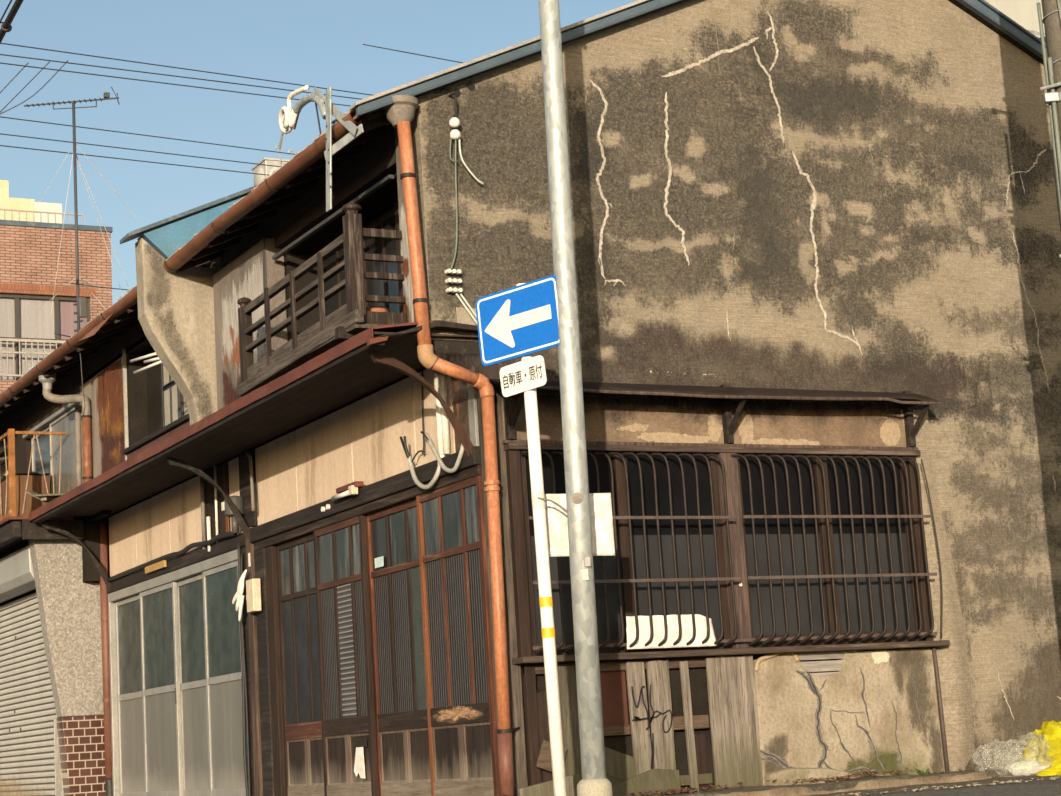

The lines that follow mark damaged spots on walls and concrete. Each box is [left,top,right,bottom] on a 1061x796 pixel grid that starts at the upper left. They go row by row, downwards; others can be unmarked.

water stain [421,74,554,321]
crack [590,80,625,286]
crack [662,0,863,356]
crack [1006,149,1046,204]
corrosion [96,360,125,473]
corrosion [222,326,241,406]
peeling [220,258,266,375]
water stain [433,335,521,399]
water stain [534,348,561,414]
water stain [564,0,1061,773]
crack [1012,230,1050,392]
crack [760,667,924,773]